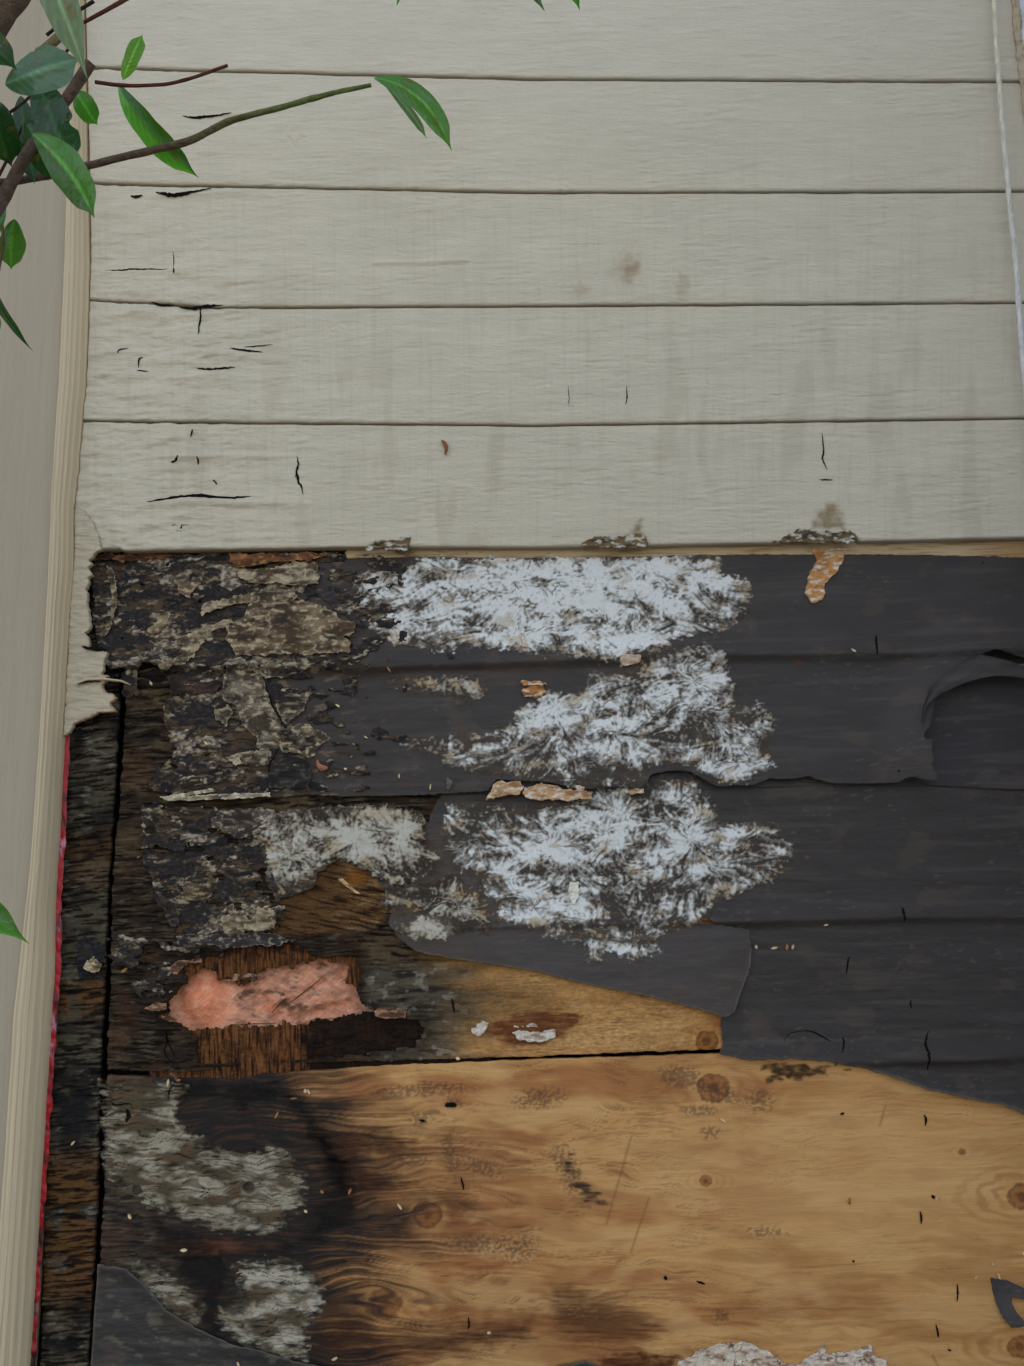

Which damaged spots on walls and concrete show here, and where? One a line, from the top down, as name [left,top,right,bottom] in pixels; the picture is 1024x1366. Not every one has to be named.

spalling [582,533,648,549]
peeling [93,552,184,637]
peeling [147,551,428,844]
water stain [233,553,794,963]
peeling [149,857,424,950]
peeling [471,1020,488,1036]
peeling [512,1023,556,1043]
water stain [165,1080,409,1248]
water stain [391,1326,525,1350]
peeling [677,1341,887,1366]